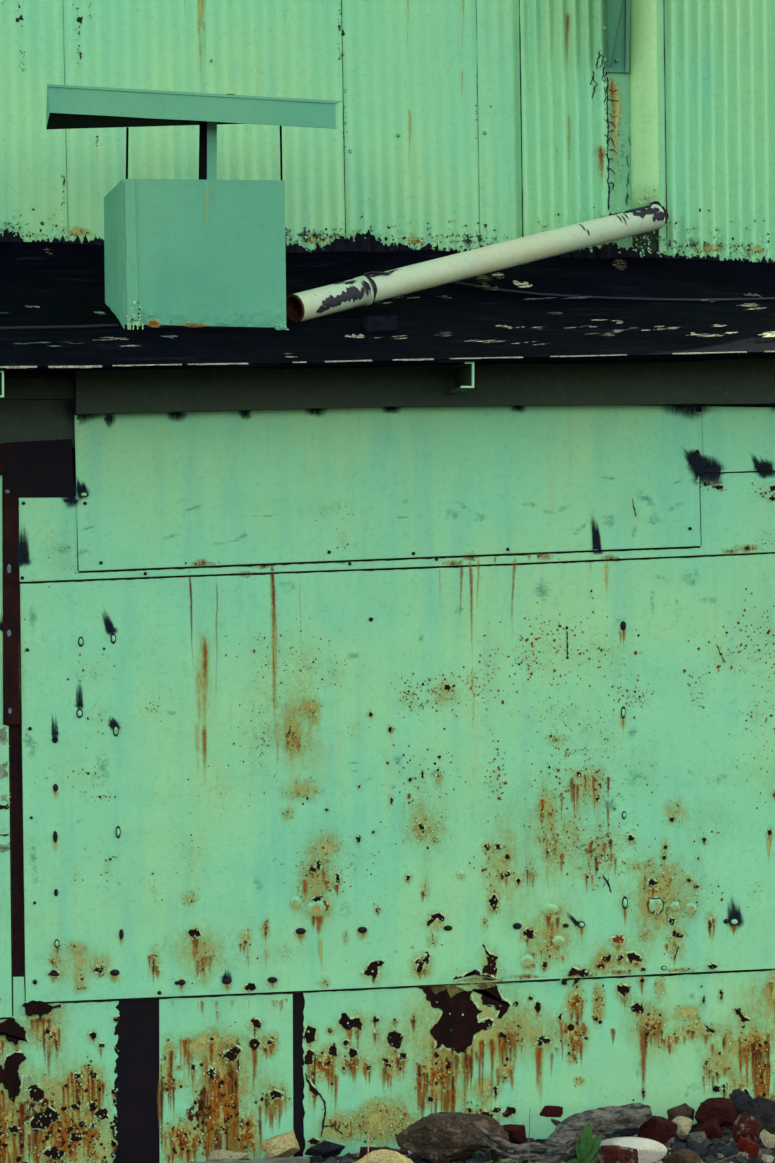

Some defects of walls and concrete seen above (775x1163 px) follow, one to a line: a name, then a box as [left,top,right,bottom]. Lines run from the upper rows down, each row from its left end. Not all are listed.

corrosion [599,82,627,182]
peeling [699,480,727,492]
corrosion [189,578,218,758]
corrosion [185,560,277,701]
corrosion [276,699,322,758]
corrosion [523,735,715,941]
corrosion [471,896,584,982]
peeling [0,1000,122,1163]
corrosion [159,1022,290,1163]
peeling [302,944,541,1120]
peeling [533,1012,562,1075]